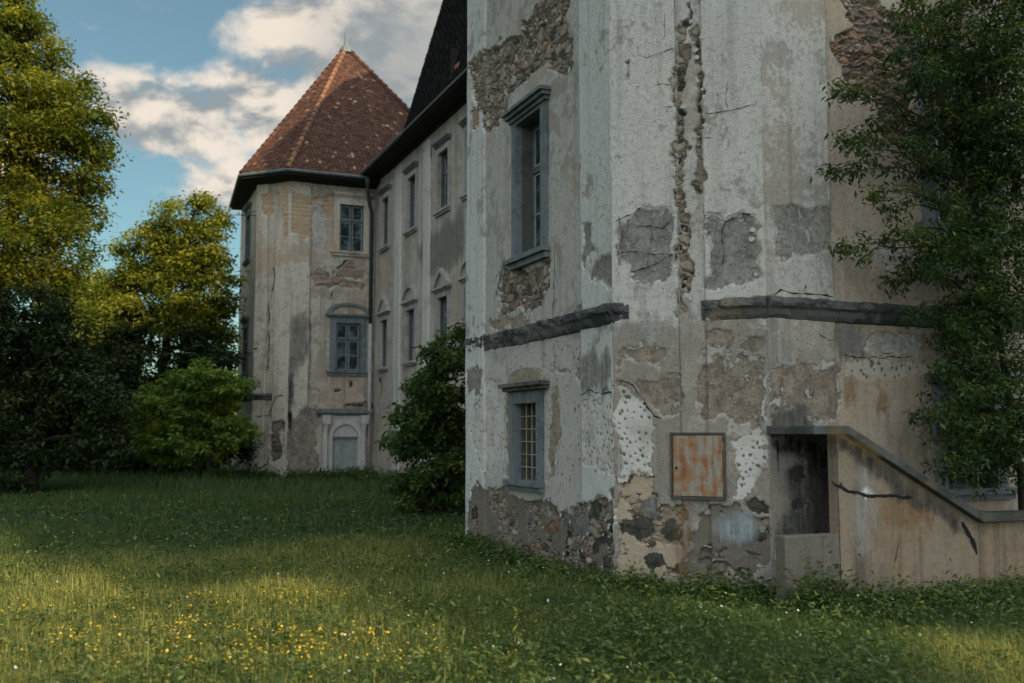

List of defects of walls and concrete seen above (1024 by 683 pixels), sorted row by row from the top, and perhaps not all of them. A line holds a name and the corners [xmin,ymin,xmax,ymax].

flaking render [434,0,574,143]
flaking render [830,0,967,149]
peeling [581,6,833,318]
flaking render [310,261,366,290]
flaking render [485,259,551,332]
leakage [287,317,307,425]
peeling [617,341,666,386]
peeling [267,405,323,478]
flaking render [467,395,774,583]
leakage [771,405,830,535]
crack [831,481,913,499]
crack [962,521,977,554]